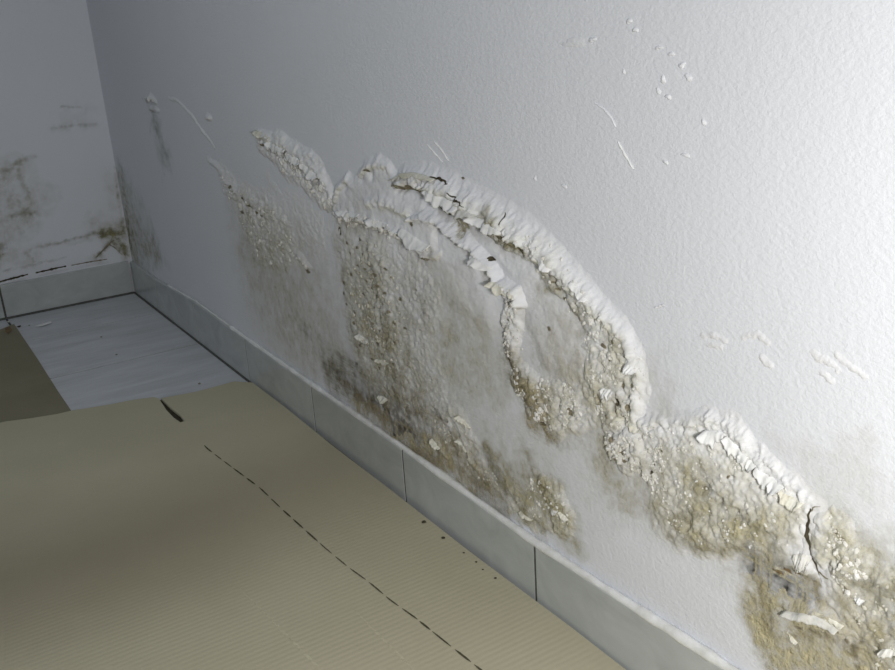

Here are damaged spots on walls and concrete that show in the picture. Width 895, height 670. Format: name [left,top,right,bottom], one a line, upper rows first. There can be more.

leakage [99,221,134,255]
peeling [250,127,895,670]
leakage [485,447,563,526]
crack [804,506,839,585]
leakage [720,512,887,670]